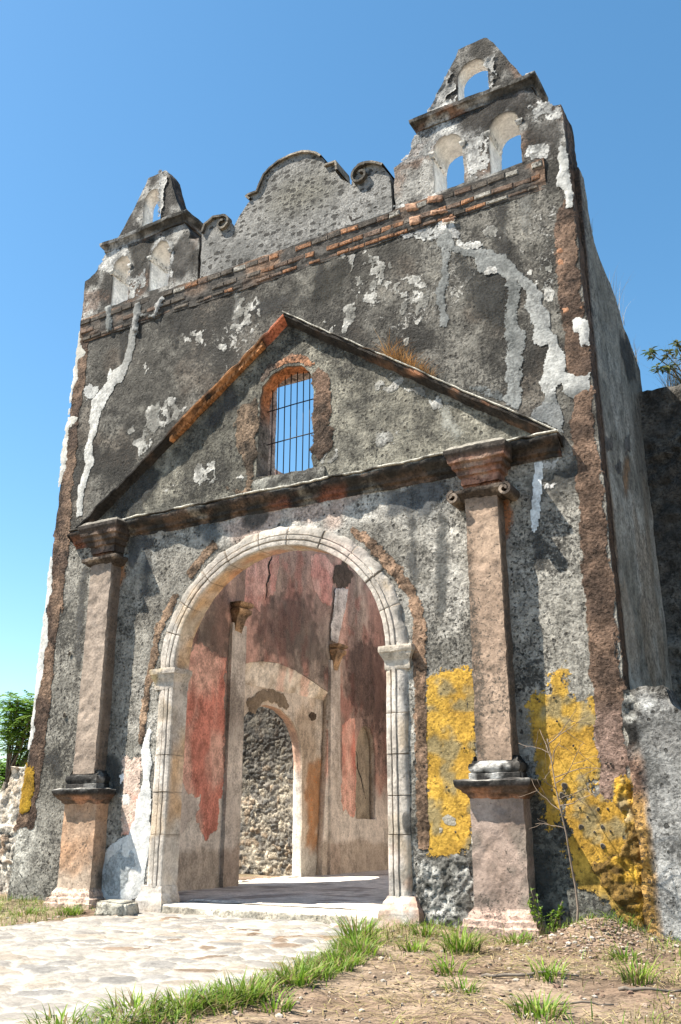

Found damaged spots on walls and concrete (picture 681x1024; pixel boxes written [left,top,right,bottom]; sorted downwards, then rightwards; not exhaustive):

flaking render [13,337,89,831]
water stain [76,324,139,517]
water stain [110,466,161,516]
flaking render [260,353,338,464]
water stain [434,194,591,432]
flaking render [527,186,644,922]
water stain [533,849,560,930]